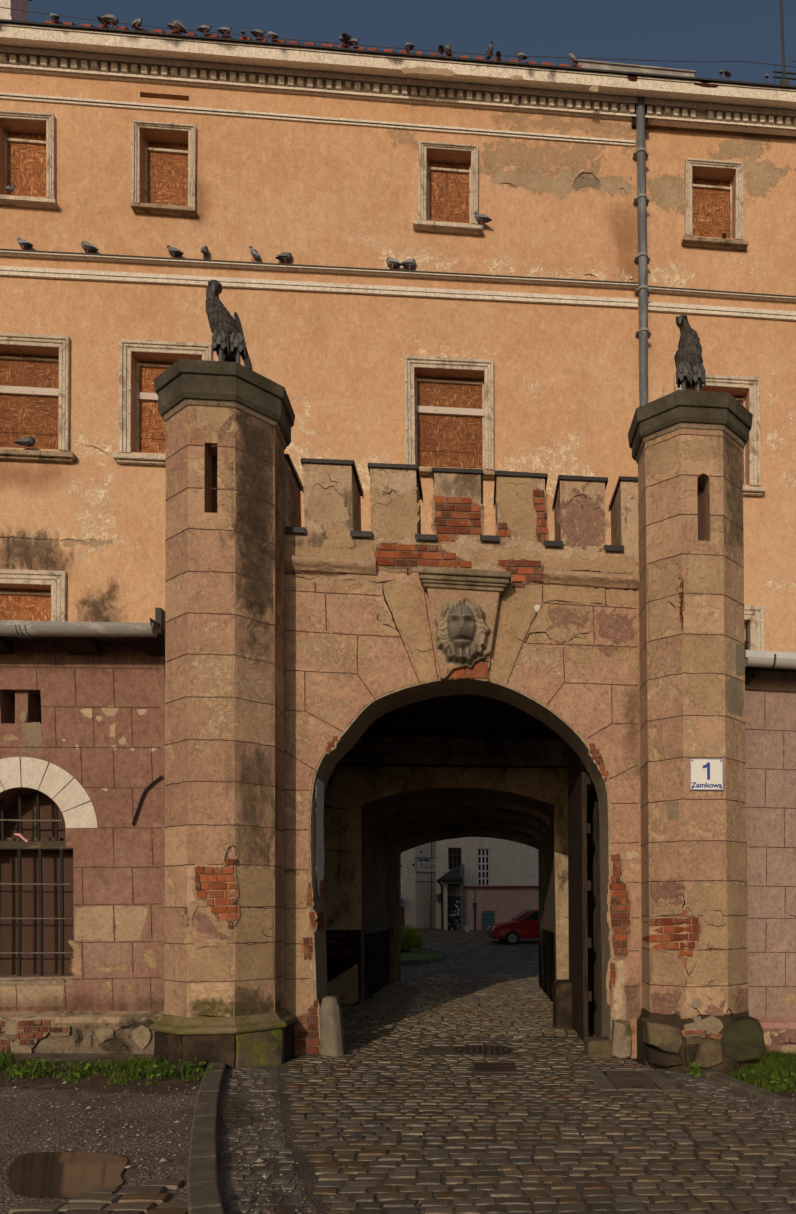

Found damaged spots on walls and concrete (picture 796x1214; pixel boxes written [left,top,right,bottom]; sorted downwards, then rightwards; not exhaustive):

peeling [473,108,685,215]
peeling [708,133,796,202]
damp [1,534,65,570]
damp [232,413,279,623]
crack [290,576,433,653]
peeling [270,396,748,1039]
peeling [0,905,158,1053]
peeling [179,823,359,1057]